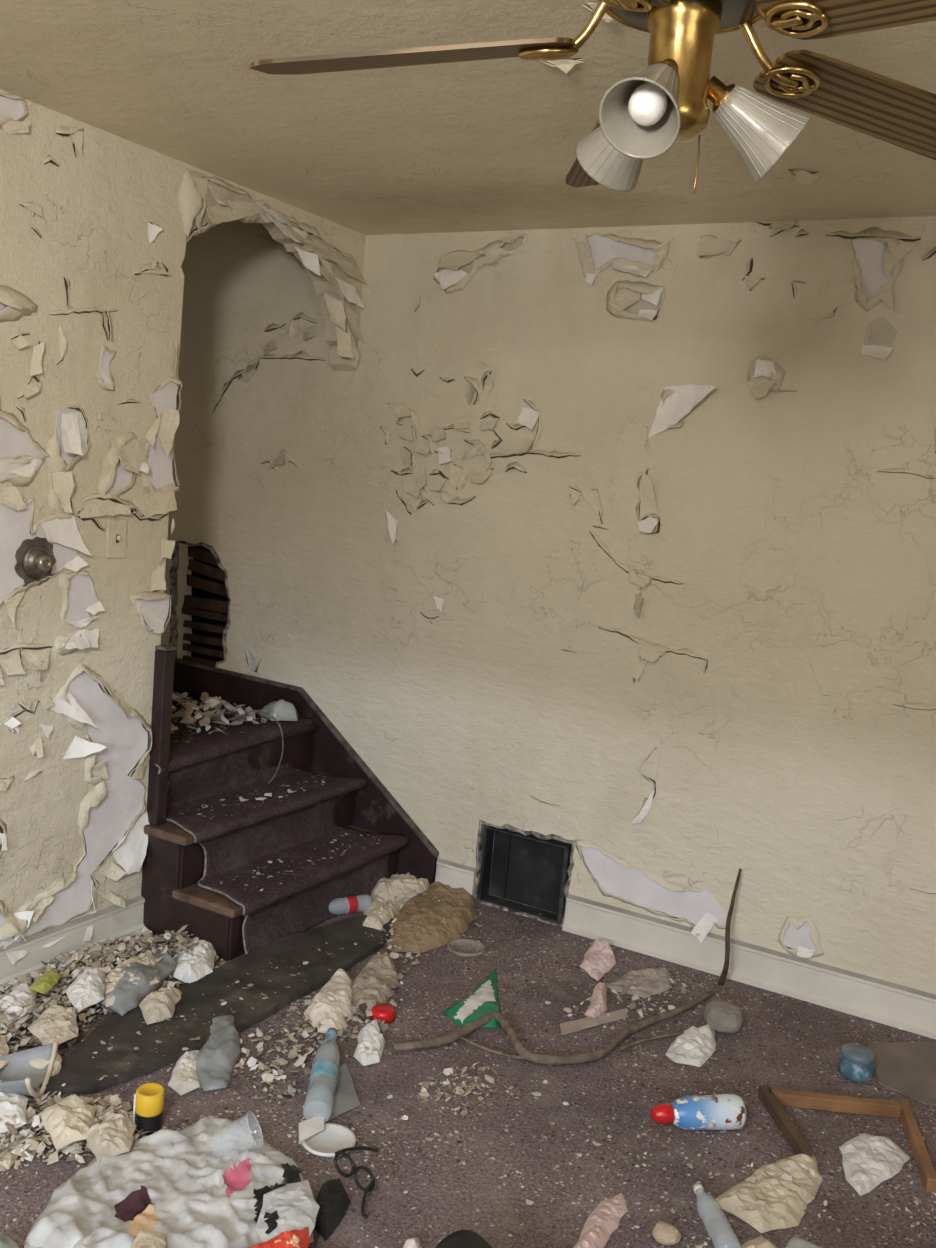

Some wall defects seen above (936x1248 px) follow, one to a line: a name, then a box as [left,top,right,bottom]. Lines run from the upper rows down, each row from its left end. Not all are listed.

peeling [0,285,38,322]
flaking render [178,169,369,371]
peeling [575,233,670,322]
peeling [97,341,183,499]
peeling [648,384,716,437]
crack [380,368,708,683]
flaking render [130,541,231,668]
peeling [0,390,152,965]
crack [0,642,56,873]
peeling [474,819,728,944]
peeling [0,967,106,1045]
peeling [0,1092,137,1163]